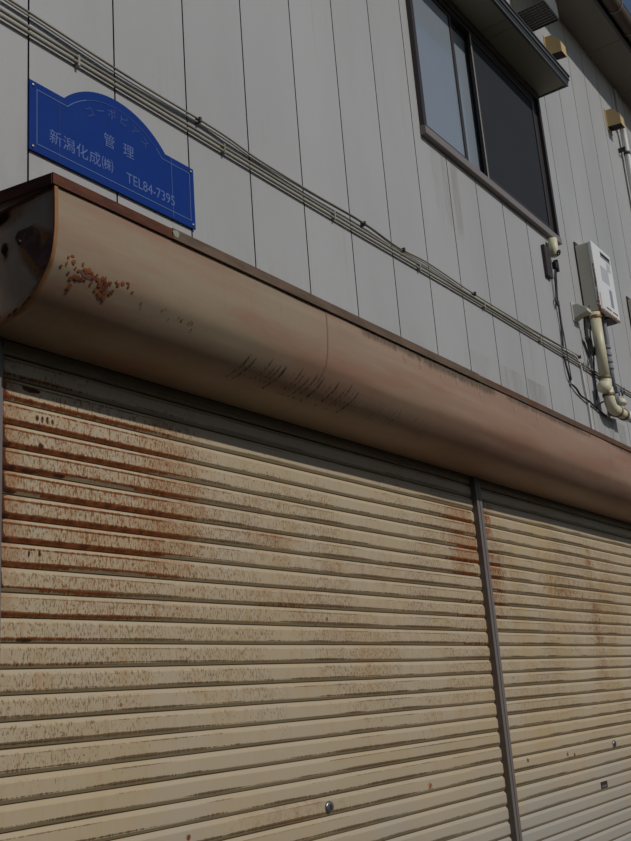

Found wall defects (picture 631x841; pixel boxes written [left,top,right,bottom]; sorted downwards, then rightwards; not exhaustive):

rust [0,226,134,321]
rust [1,357,212,620]
rust [442,507,479,576]
rust [488,543,509,606]